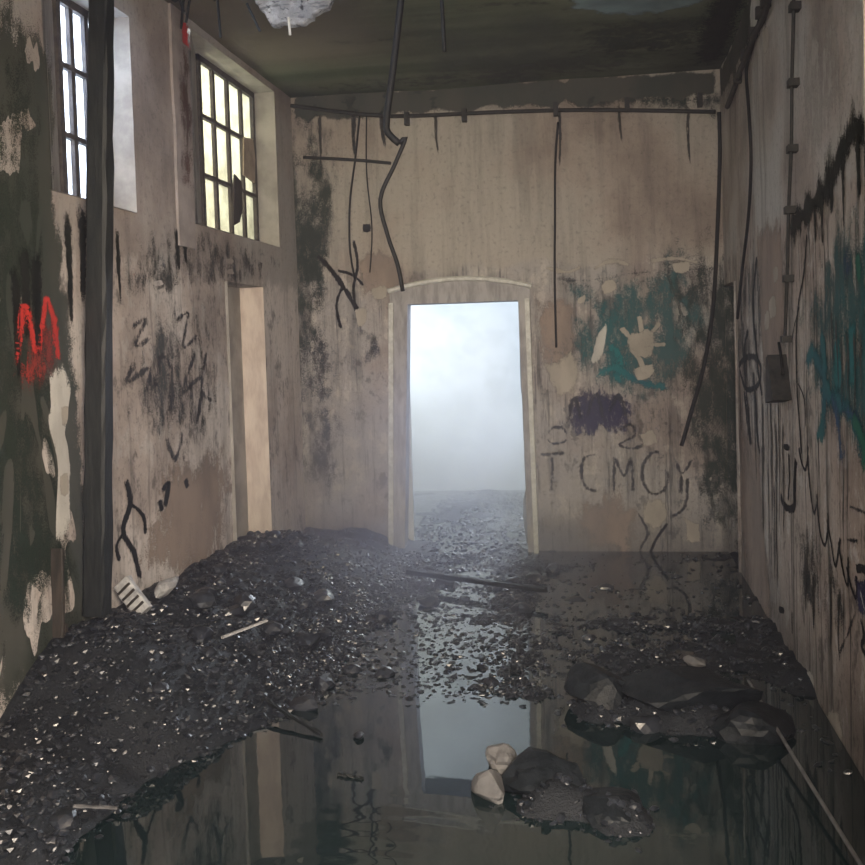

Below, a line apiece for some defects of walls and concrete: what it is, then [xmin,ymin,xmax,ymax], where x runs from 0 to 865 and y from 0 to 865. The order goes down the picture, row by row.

leakage [291,0,766,511]
leakage [663,228,784,590]
leakage [790,97,865,247]
leakage [796,528,845,656]